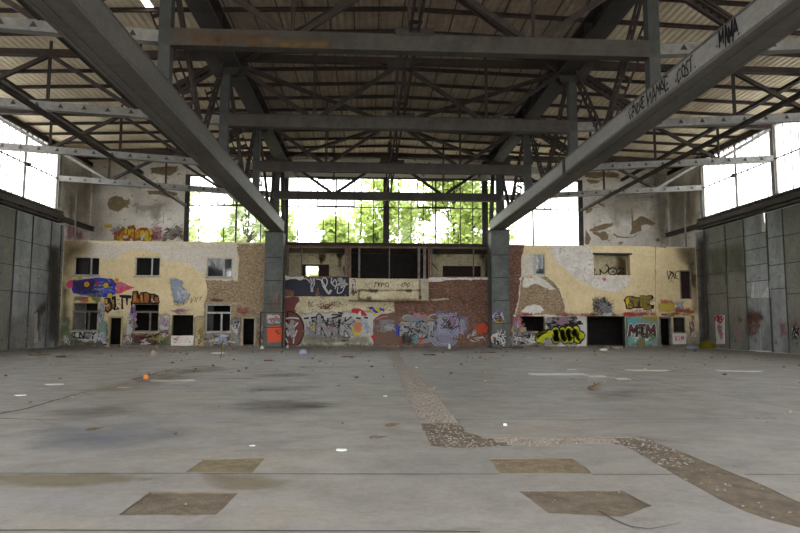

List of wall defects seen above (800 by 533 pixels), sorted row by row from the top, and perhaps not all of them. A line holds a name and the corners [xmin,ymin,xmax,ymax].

flaking render [150,166,179,176]
flaking render [584,171,619,184]
flaking render [107,196,131,212]
flaking render [630,209,656,235]
flaking render [550,223,632,292]
flaking render [87,225,265,346]
flaking render [509,244,566,346]